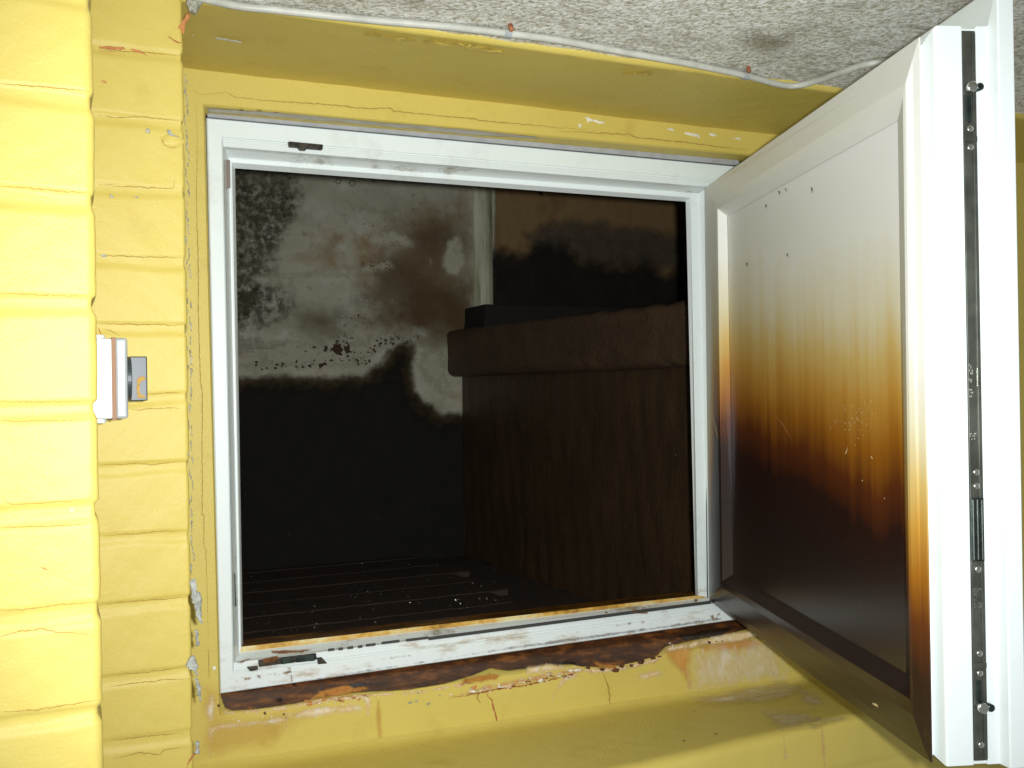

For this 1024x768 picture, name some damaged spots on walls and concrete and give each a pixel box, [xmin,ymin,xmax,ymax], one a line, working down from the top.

peeling [99,46,147,56]
peeling [167,76,203,701]
crack [0,83,747,637]
leakage [208,614,747,735]
peeling [408,668,582,706]